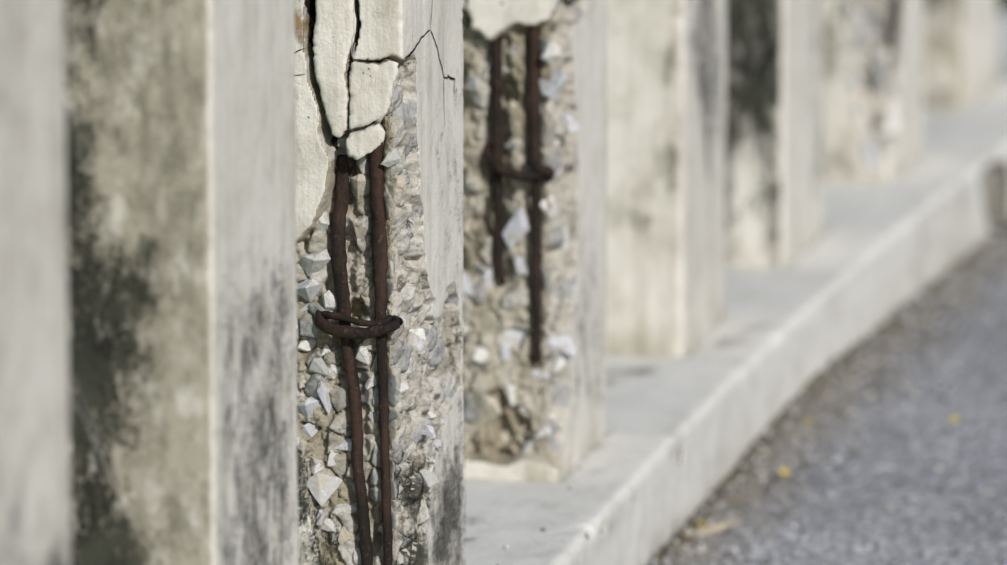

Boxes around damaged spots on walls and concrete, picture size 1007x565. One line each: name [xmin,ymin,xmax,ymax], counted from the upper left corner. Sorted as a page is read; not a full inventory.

crack [295,0,316,76]
crack [331,136,339,149]
crack [352,0,455,87]
water stain [687,0,782,267]
water stain [0,0,192,565]
water stain [207,238,340,565]
water stain [393,396,473,565]
spalling [295,0,587,565]